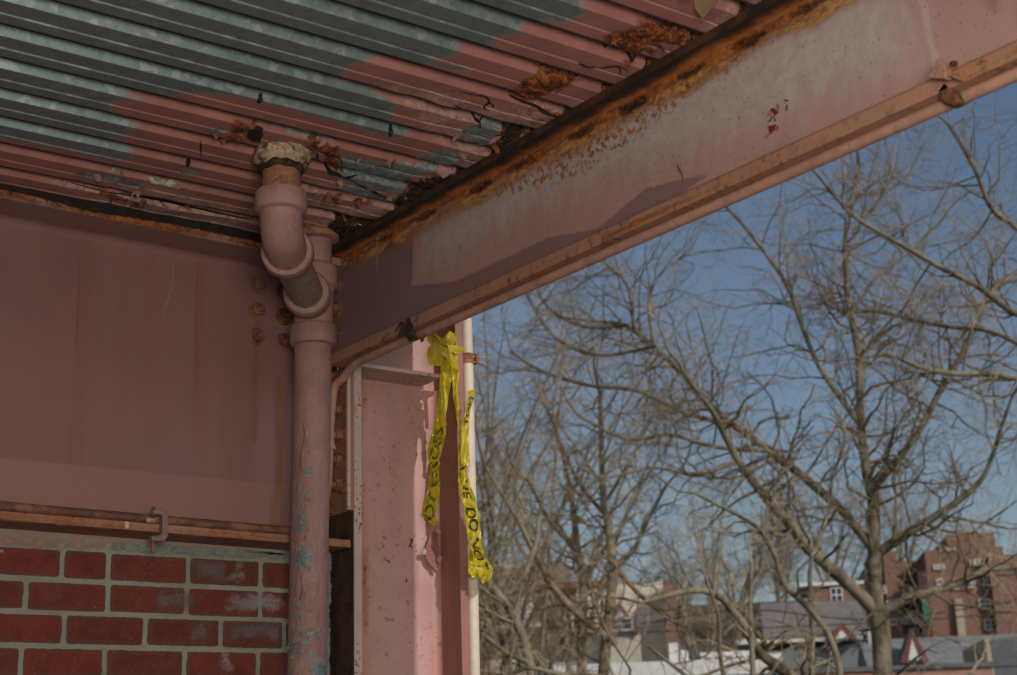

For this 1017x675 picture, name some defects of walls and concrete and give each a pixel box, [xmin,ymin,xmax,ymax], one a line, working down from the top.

rust [0,189,262,248]
rust [217,119,263,145]
rust [306,133,464,241]
peeling [334,115,501,206]
rust [340,0,858,268]
peeling [290,490,313,582]
peeling [286,600,330,675]